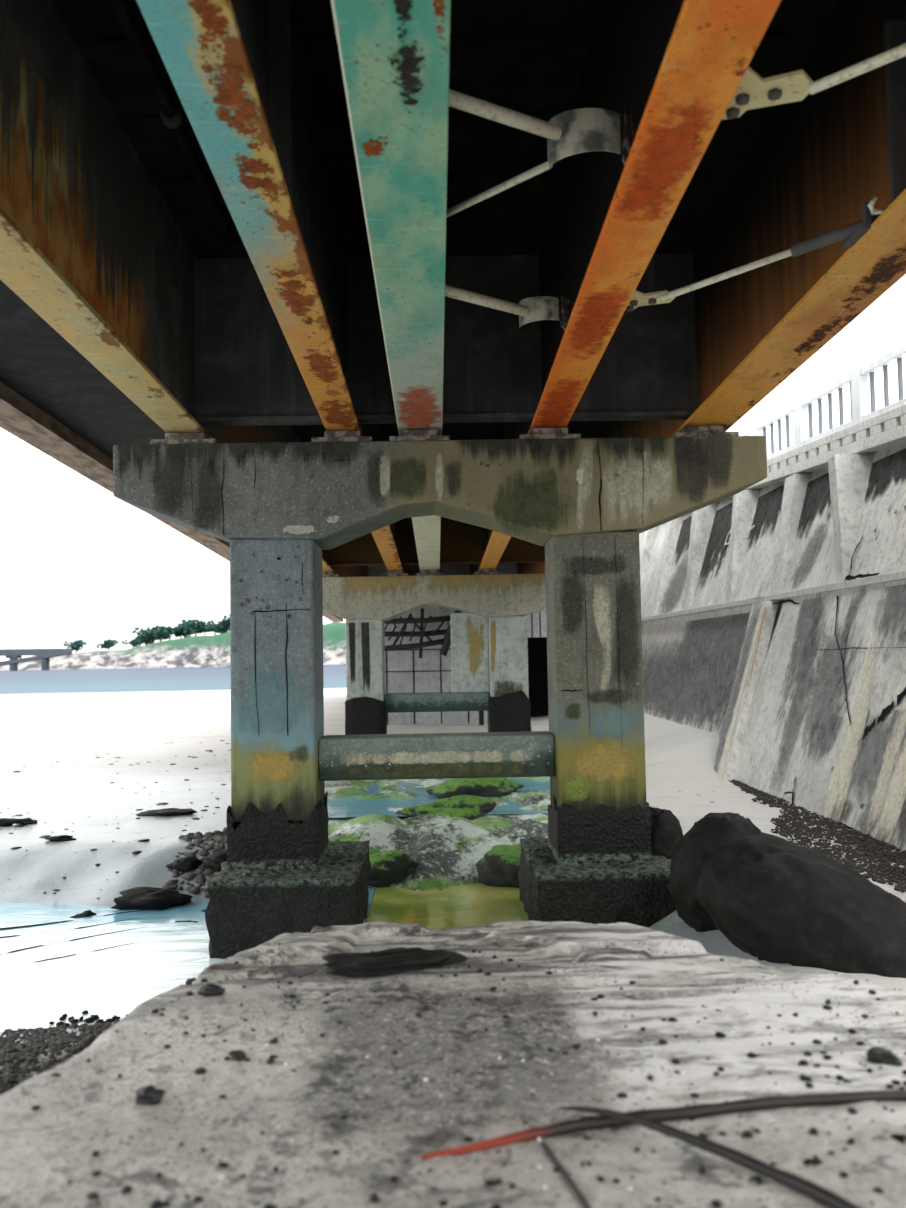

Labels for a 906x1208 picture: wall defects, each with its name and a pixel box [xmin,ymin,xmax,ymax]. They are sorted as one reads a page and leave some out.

rust [0,55,143,361]
rust [188,0,281,214]
rust [270,268,315,325]
rust [386,0,425,113]
rust [789,245,906,359]
crack [561,453,622,746]
water stain [460,430,733,535]
water stain [562,557,759,770]
water stain [695,502,733,593]
water stain [745,484,785,554]
water stain [772,584,906,848]
crack [806,537,906,743]